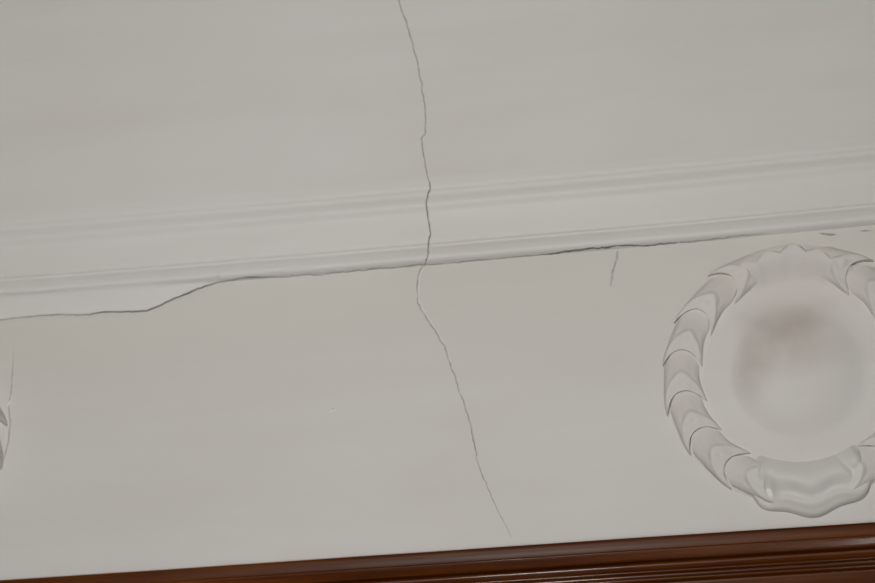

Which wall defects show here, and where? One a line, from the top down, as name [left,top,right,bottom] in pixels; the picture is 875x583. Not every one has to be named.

crack [0,0,757,536]